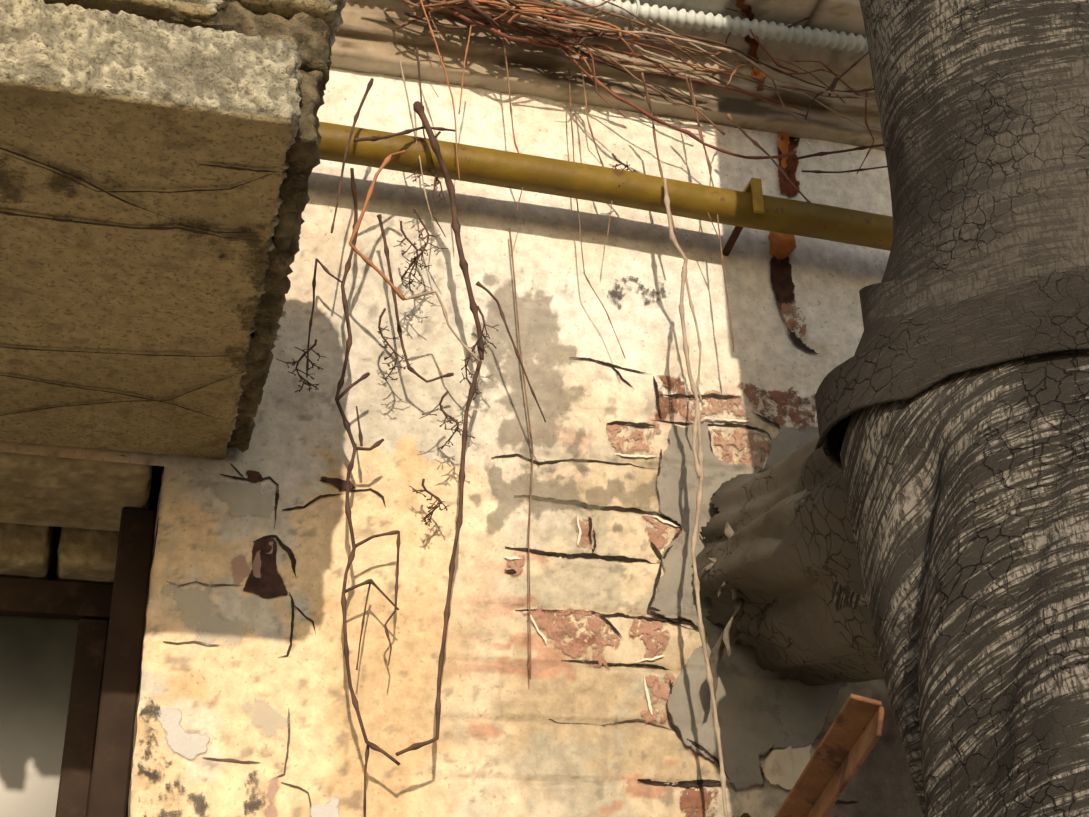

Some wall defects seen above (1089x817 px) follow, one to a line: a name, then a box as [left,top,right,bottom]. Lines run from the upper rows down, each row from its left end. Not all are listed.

crack [735,0,766,91]
crack [0,147,285,242]
crack [777,132,800,197]
crack [768,231,818,354]
crack [0,346,256,425]
spalling [606,375,817,470]
spalling [232,535,297,598]
spalling [643,514,682,562]
spalling [521,608,670,669]
water stain [137,697,208,817]
water stain [244,771,265,815]
spalling [679,781,721,817]